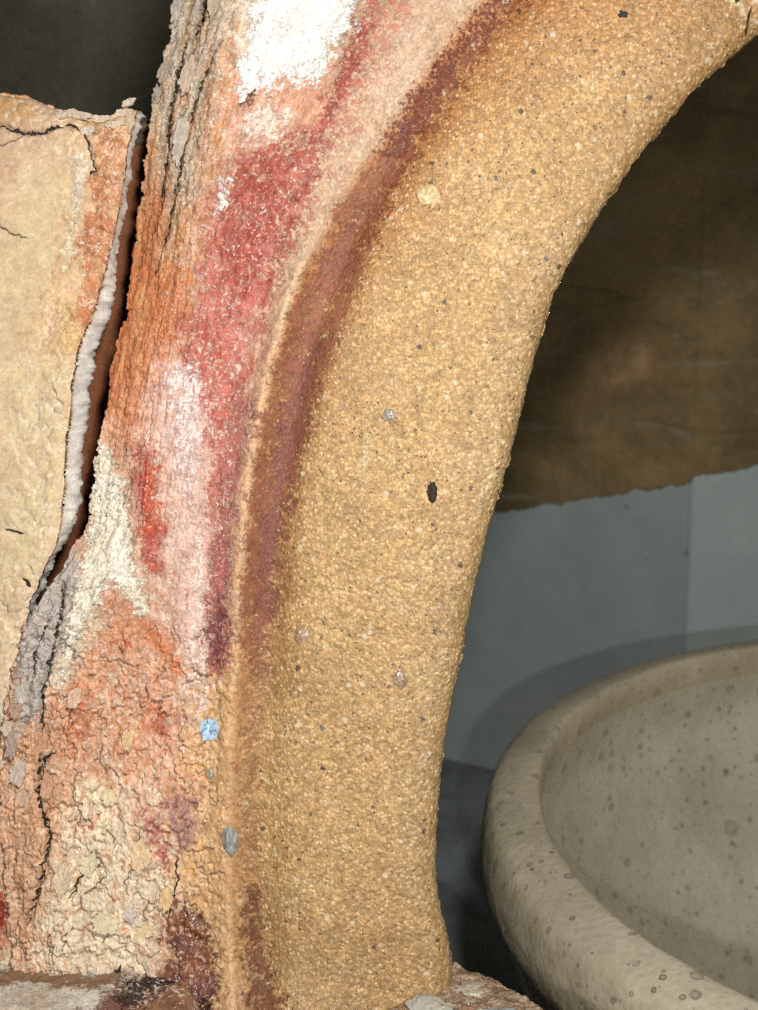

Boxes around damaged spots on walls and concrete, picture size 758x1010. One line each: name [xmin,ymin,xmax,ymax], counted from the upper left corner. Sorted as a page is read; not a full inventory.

peeling [170,0,187,27]
peeling [207,0,220,24]
crack [729,0,752,34]
peeling [152,47,198,104]
crack [0,124,97,177]
peeling [172,110,190,167]
peeling [211,176,237,216]
leakage [566,335,665,408]
leakage [0,0,530,1010]
crack [27,584,180,957]